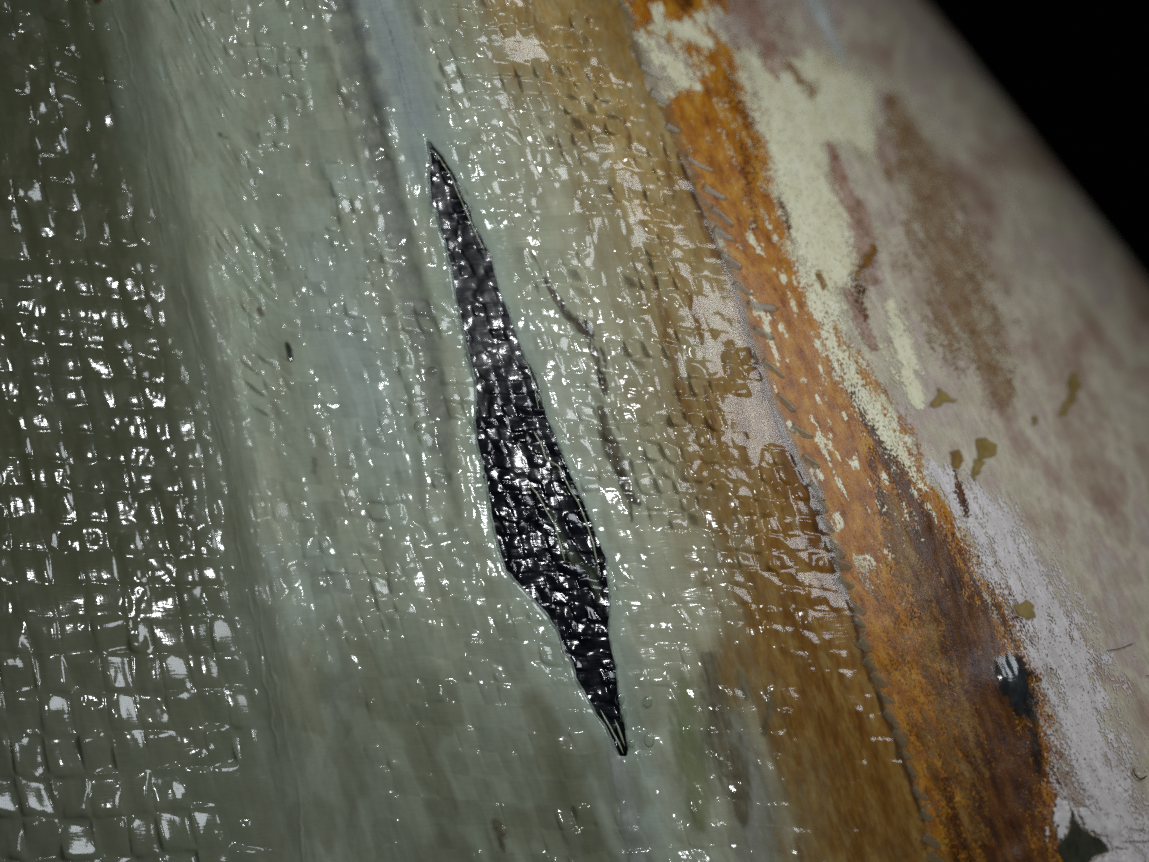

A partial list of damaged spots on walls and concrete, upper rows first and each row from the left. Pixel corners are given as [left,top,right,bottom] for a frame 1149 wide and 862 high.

crack [532,253,641,521]
corrosion [486,0,1096,862]
peeling [1045,798,1142,862]